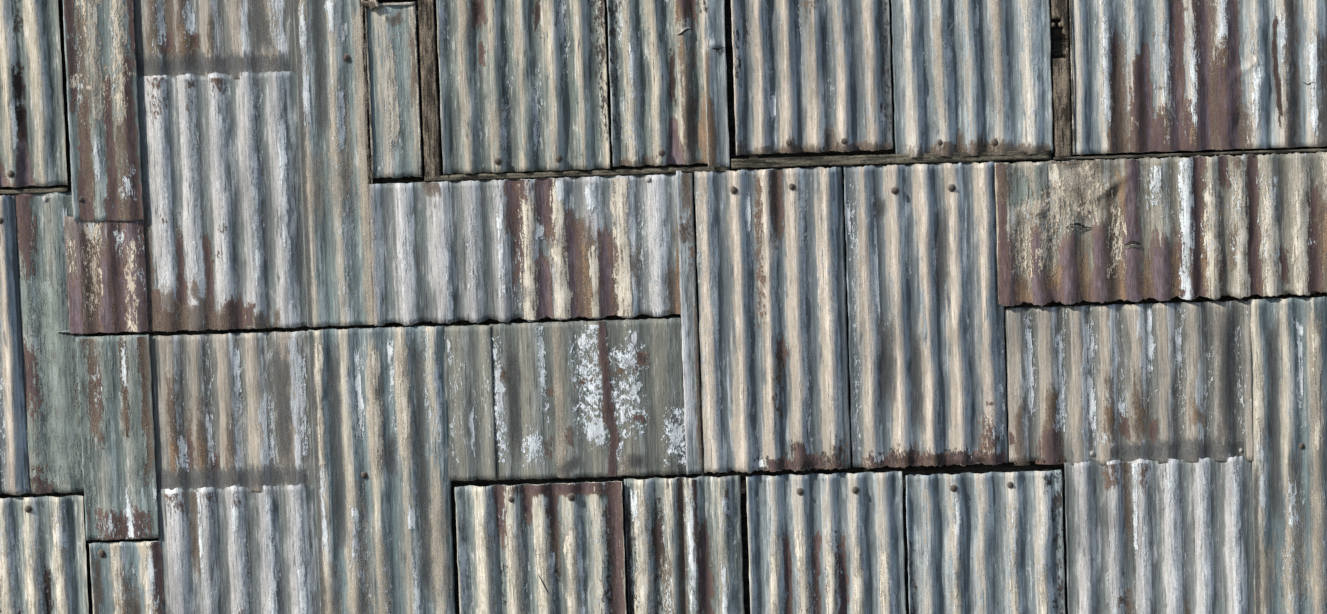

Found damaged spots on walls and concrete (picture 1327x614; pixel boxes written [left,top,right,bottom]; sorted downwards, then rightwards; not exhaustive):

corrosion [87,504,164,614]
corrosion [64,0,280,578]
peeling [298,2,314,140]
peeling [293,334,333,561]
peeling [344,178,573,614]
peeling [455,489,612,614]
corrosion [504,178,641,321]
peeling [568,178,686,471]
peeling [626,484,697,614]
corrosion [753,169,1066,473]
corrosion [736,0,1289,306]
corrosion [1281,0,1327,148]